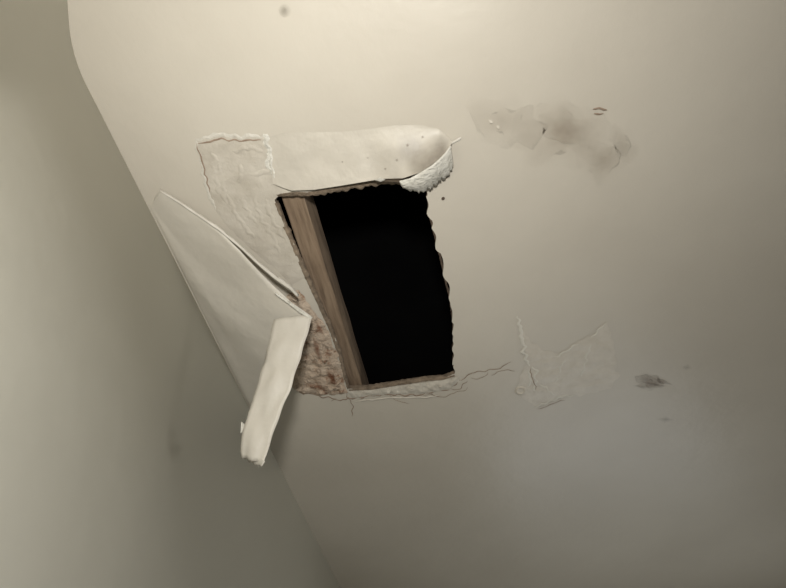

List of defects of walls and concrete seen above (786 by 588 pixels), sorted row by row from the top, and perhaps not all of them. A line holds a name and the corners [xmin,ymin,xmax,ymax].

peeling [151,132,462,467]
crack [313,362,511,416]